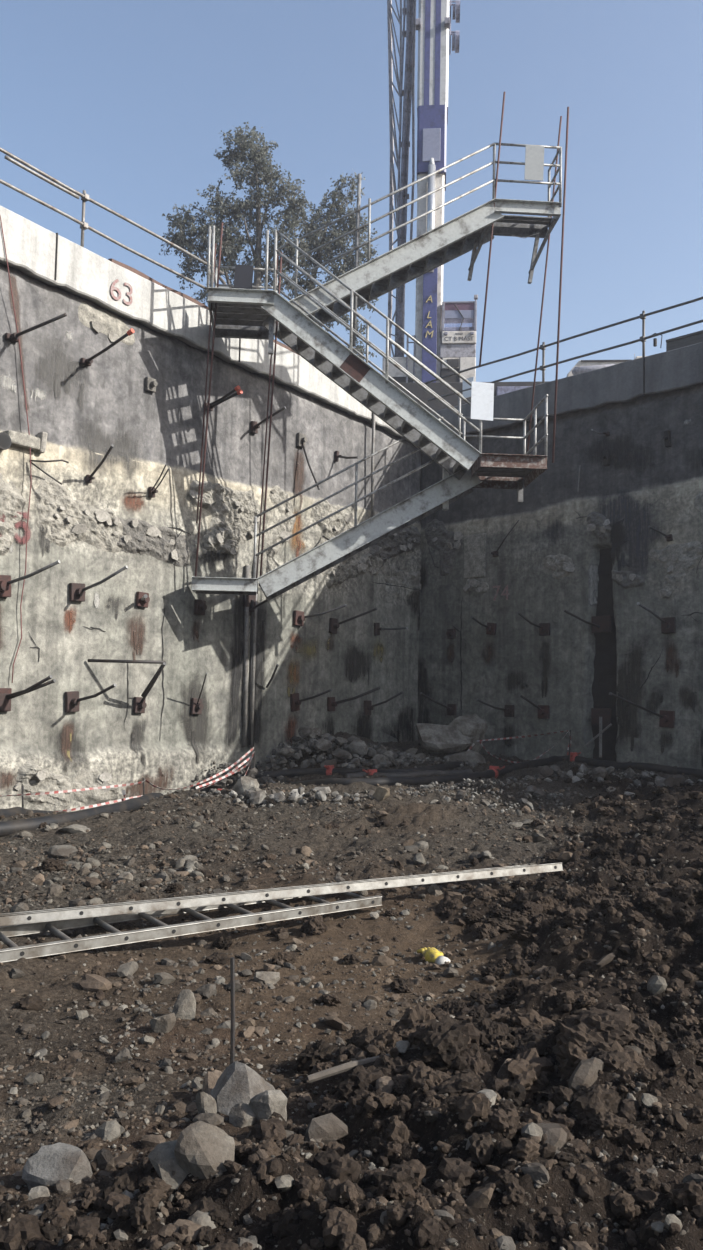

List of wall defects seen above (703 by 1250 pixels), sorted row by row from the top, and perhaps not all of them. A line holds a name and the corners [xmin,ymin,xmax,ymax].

damp [178,683,209,763]
damp [224,595,266,747]